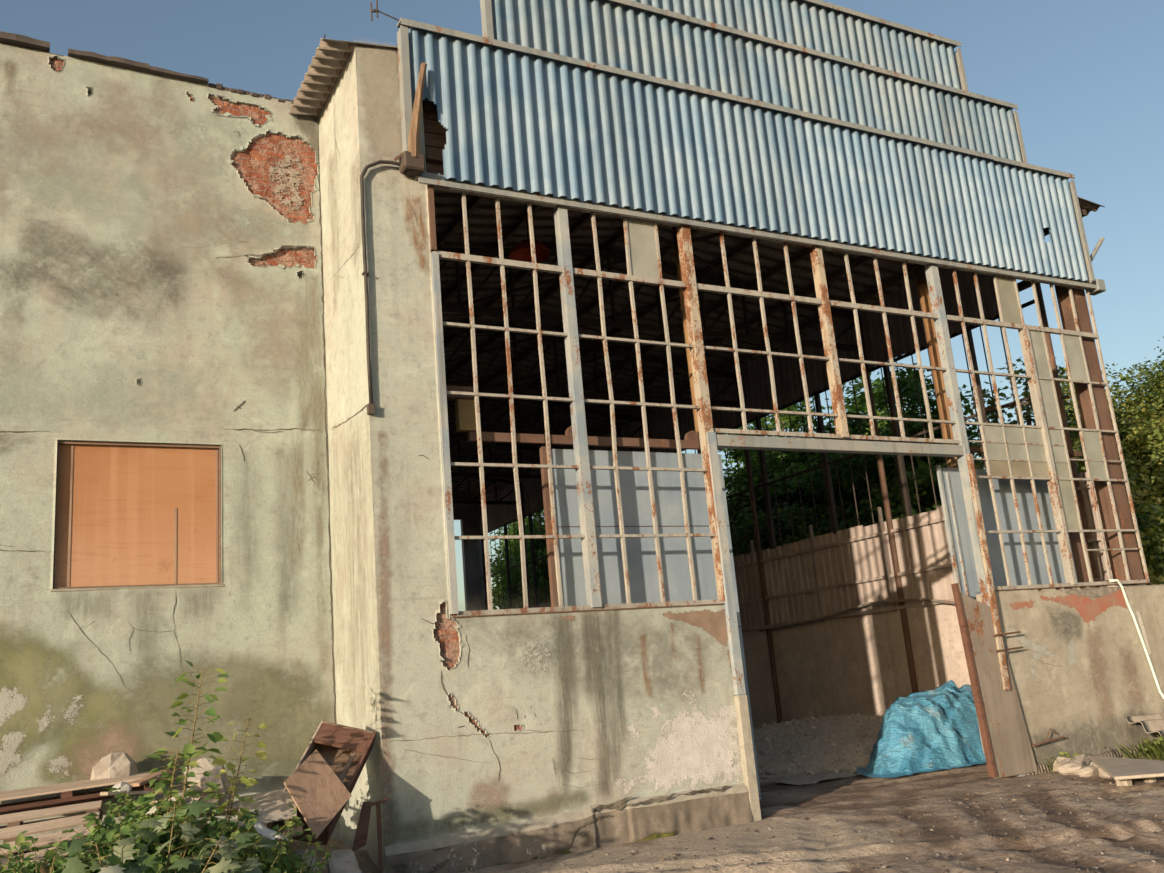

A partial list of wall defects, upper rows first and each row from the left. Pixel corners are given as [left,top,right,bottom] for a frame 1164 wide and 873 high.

flaking render [208,94,319,225]
flaking render [244,244,317,269]
crack [0,428,53,436]
damp [0,684,83,777]
damp [47,730,136,780]
crack [68,593,182,720]
flaking render [433,602,464,670]
crack [393,637,729,855]
damp [521,609,742,797]